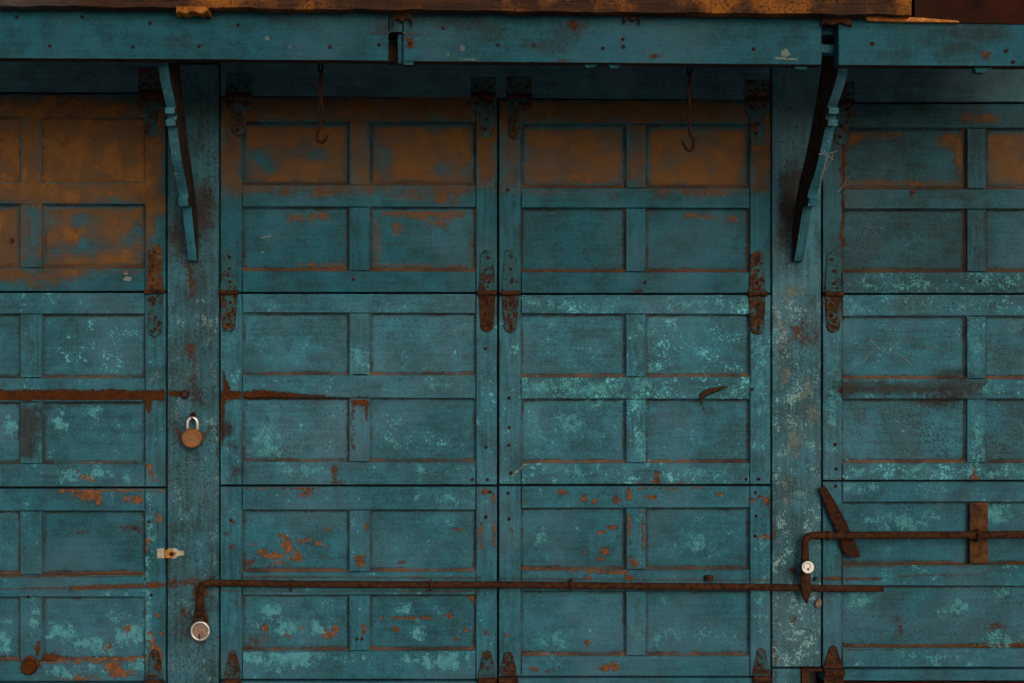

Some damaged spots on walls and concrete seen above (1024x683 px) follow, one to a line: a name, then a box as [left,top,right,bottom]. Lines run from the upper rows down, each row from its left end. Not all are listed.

rust [0,344,202,414]
peeling [0,406,22,446]
peeling [51,407,70,433]
peeling [517,309,735,581]
peeling [0,460,165,681]
peeling [245,527,331,568]
peeling [623,529,770,659]
peeling [380,602,475,672]